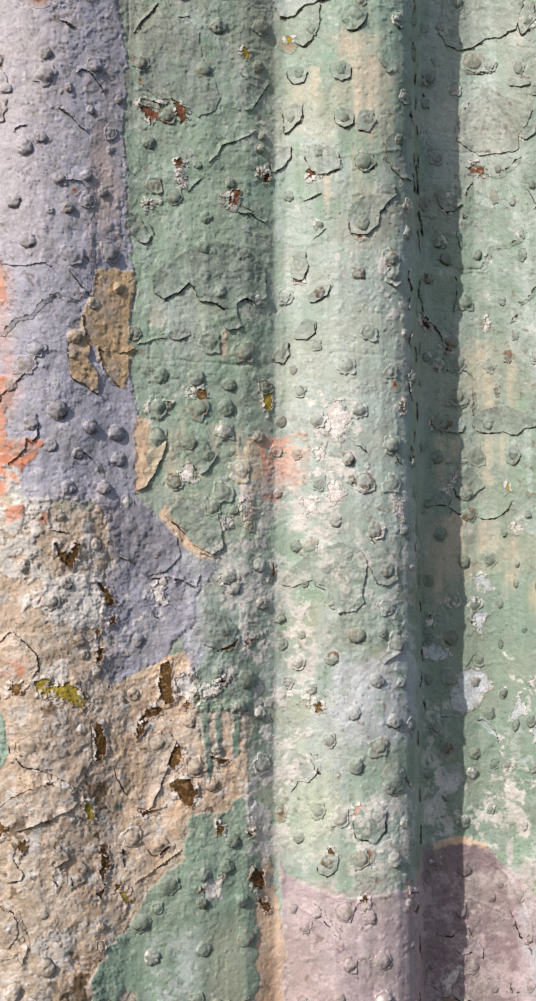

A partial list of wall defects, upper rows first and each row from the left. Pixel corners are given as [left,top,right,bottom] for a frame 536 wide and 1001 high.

crack [133,2,189,33]
peeling [273,0,322,48]
peeling [133,13,221,125]
crack [188,74,269,193]
peeling [456,75,536,179]
crack [304,193,322,201]
peeling [136,384,217,490]
peeling [50,538,84,572]
crack [0,630,40,679]
peeling [91,578,120,667]
crack [8,737,91,808]
crack [120,848,182,884]